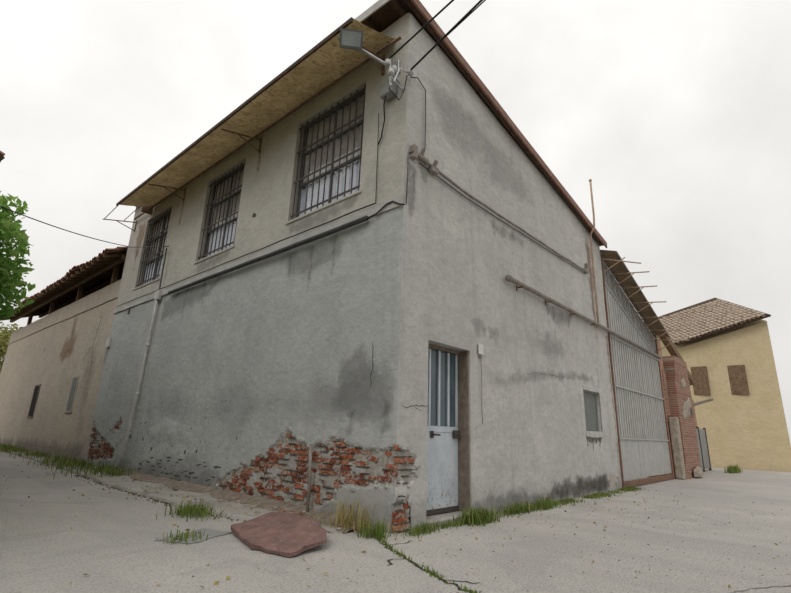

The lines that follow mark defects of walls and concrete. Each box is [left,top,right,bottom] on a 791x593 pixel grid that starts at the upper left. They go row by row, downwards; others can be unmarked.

spalling [85,416,421,533]
water stain [552,475,608,498]